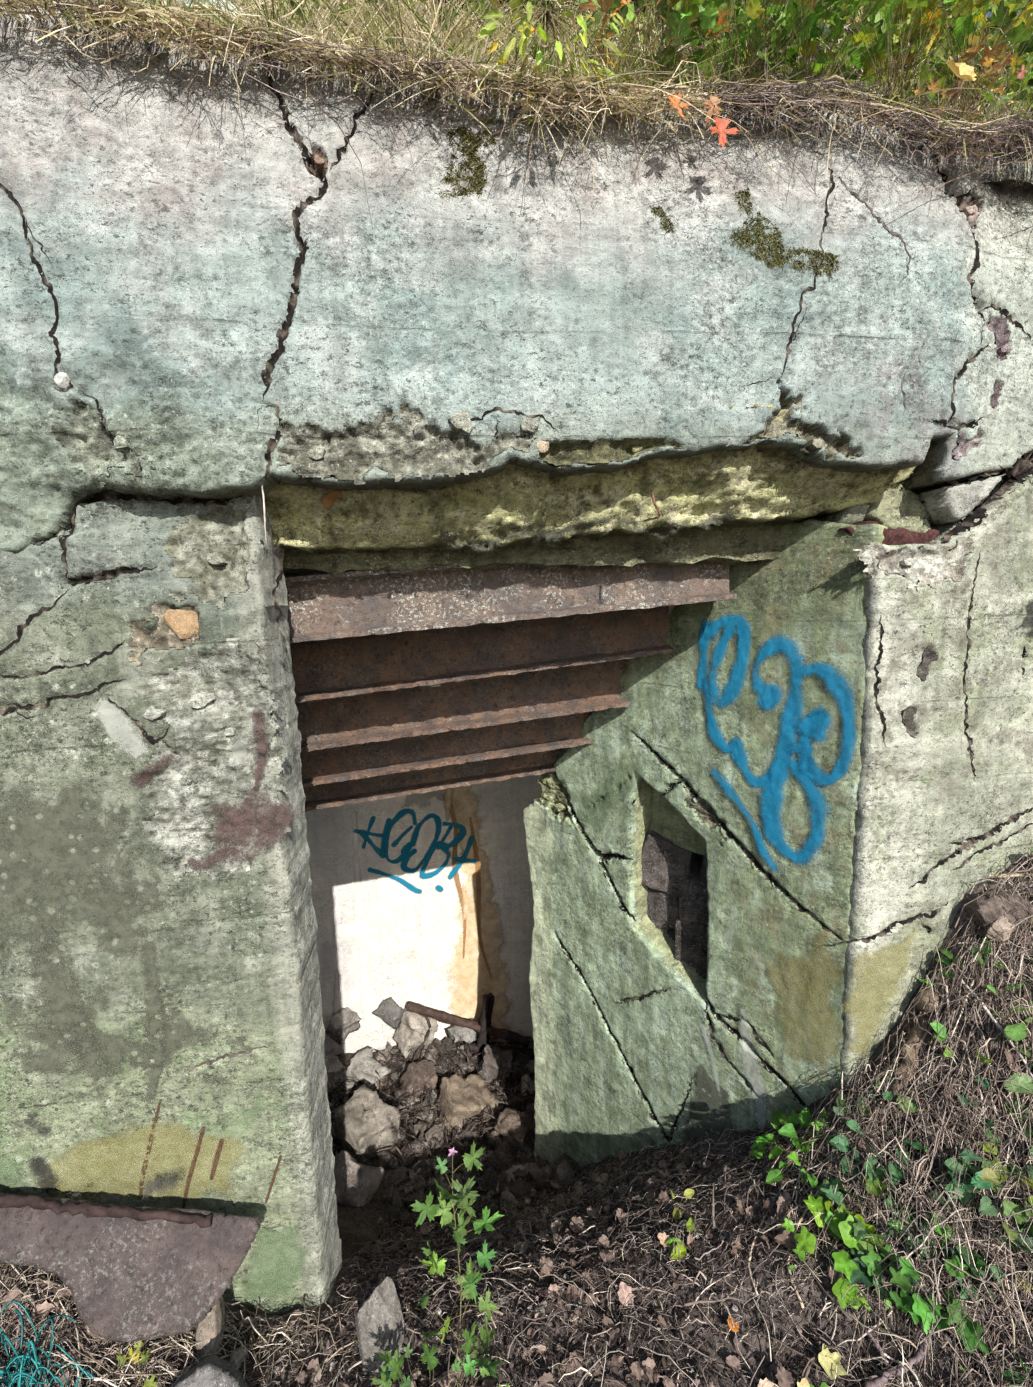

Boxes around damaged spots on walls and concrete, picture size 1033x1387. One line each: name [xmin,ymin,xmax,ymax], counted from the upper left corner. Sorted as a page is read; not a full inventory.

crack [902,154,1031,430]
crack [0,66,378,745]
spalling [277,403,684,485]
spalling [749,380,861,463]
spalling [946,430,983,460]
crack [936,451,1033,782]
leakage [406,785,509,1038]
crack [635,733,1033,944]
crack [559,939,807,1146]
corrosion [138,1099,162,1200]
corrosion [182,1127,224,1209]
corrosion [265,1155,282,1203]